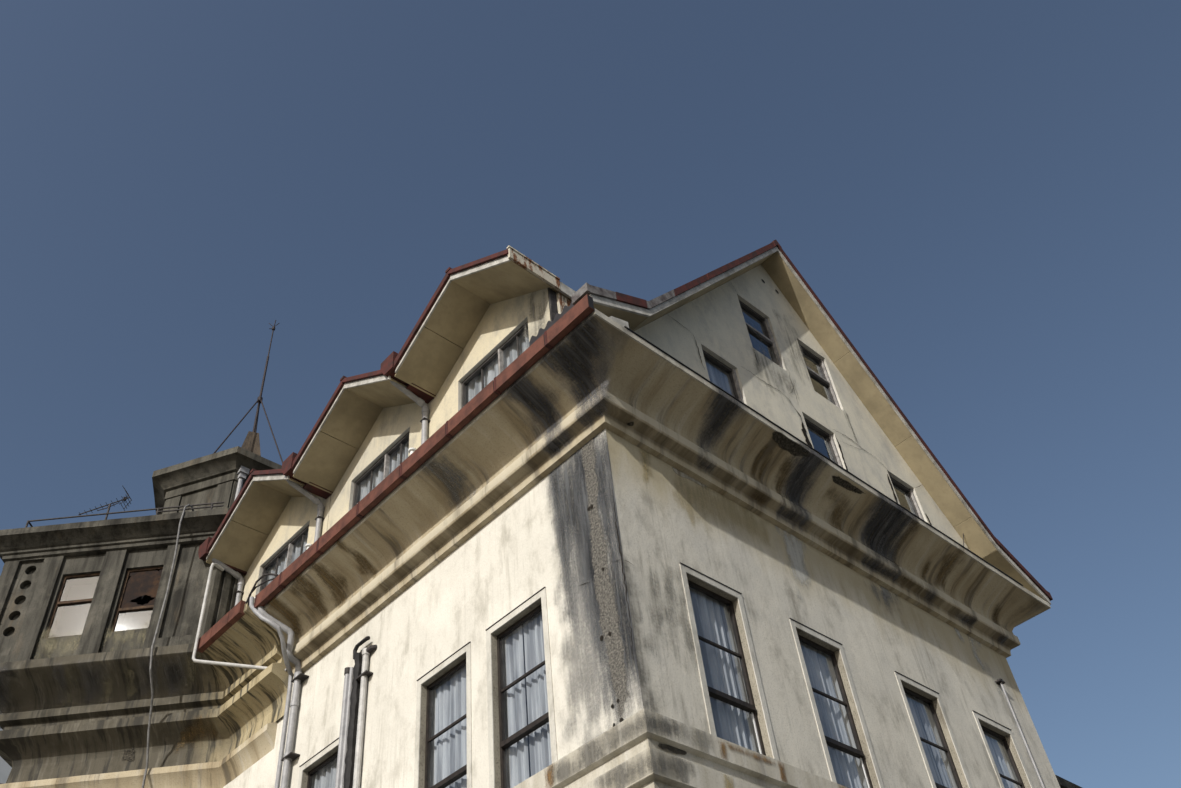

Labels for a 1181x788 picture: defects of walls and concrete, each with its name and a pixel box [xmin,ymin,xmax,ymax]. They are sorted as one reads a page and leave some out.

water stain [540,314,608,424]
water stain [698,389,742,472]
crack [741,348,932,525]
water stain [267,596,301,634]
water stain [294,564,347,616]
water stain [337,539,376,576]
water stain [507,373,675,781]
water stain [776,443,828,585]
water stain [861,493,961,606]